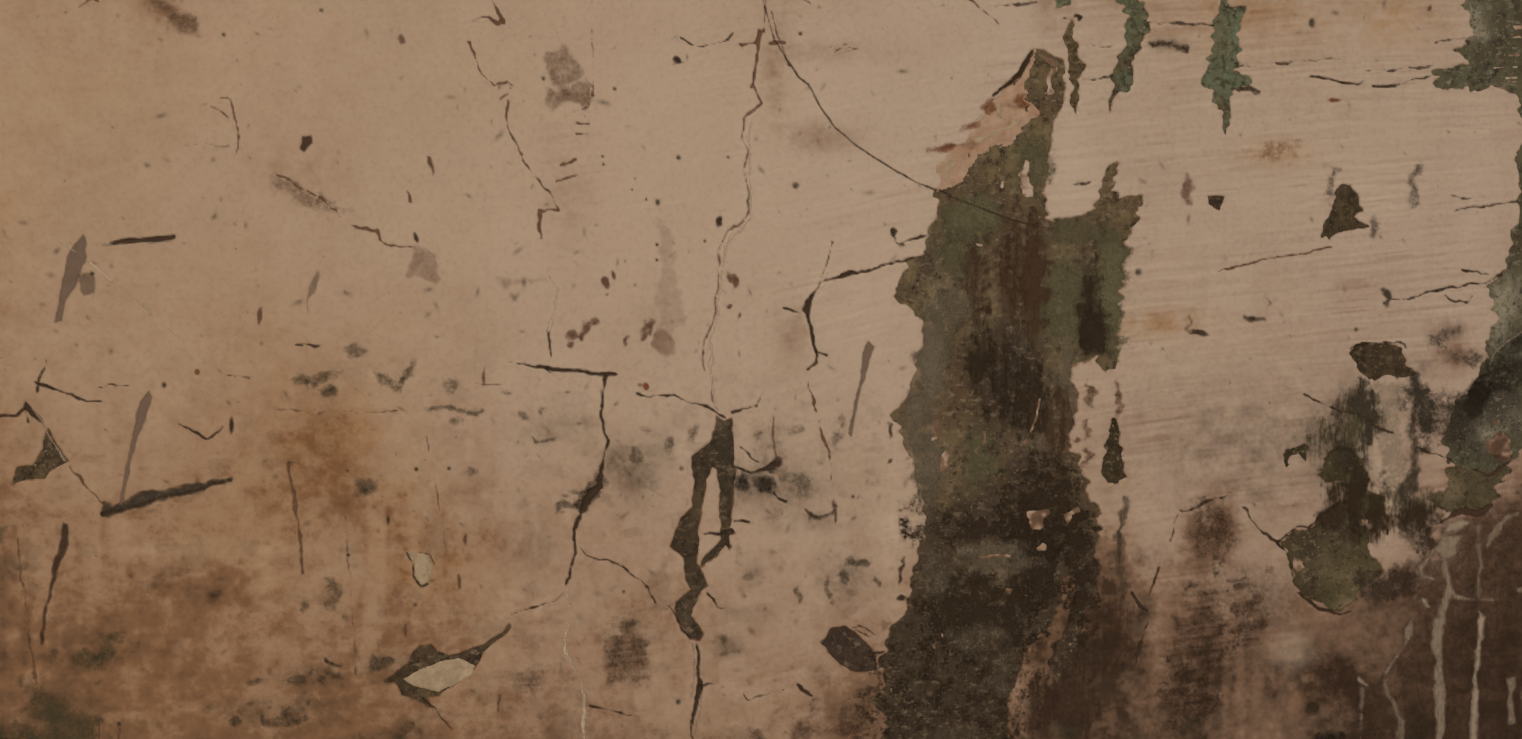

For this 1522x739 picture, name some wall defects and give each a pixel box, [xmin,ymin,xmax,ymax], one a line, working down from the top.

peeling [1201,0,1252,134]
peeling [1431,0,1522,118]
peeling [1321,184,1370,239]
crack [75,473,231,516]
crack [184,426,221,440]
crack [517,7,790,739]
crack [783,235,925,522]
peeling [821,0,1143,739]
leakage [1196,498,1233,565]
leakage [1306,330,1522,739]
peeling [1426,144,1522,513]
crack [797,683,813,696]